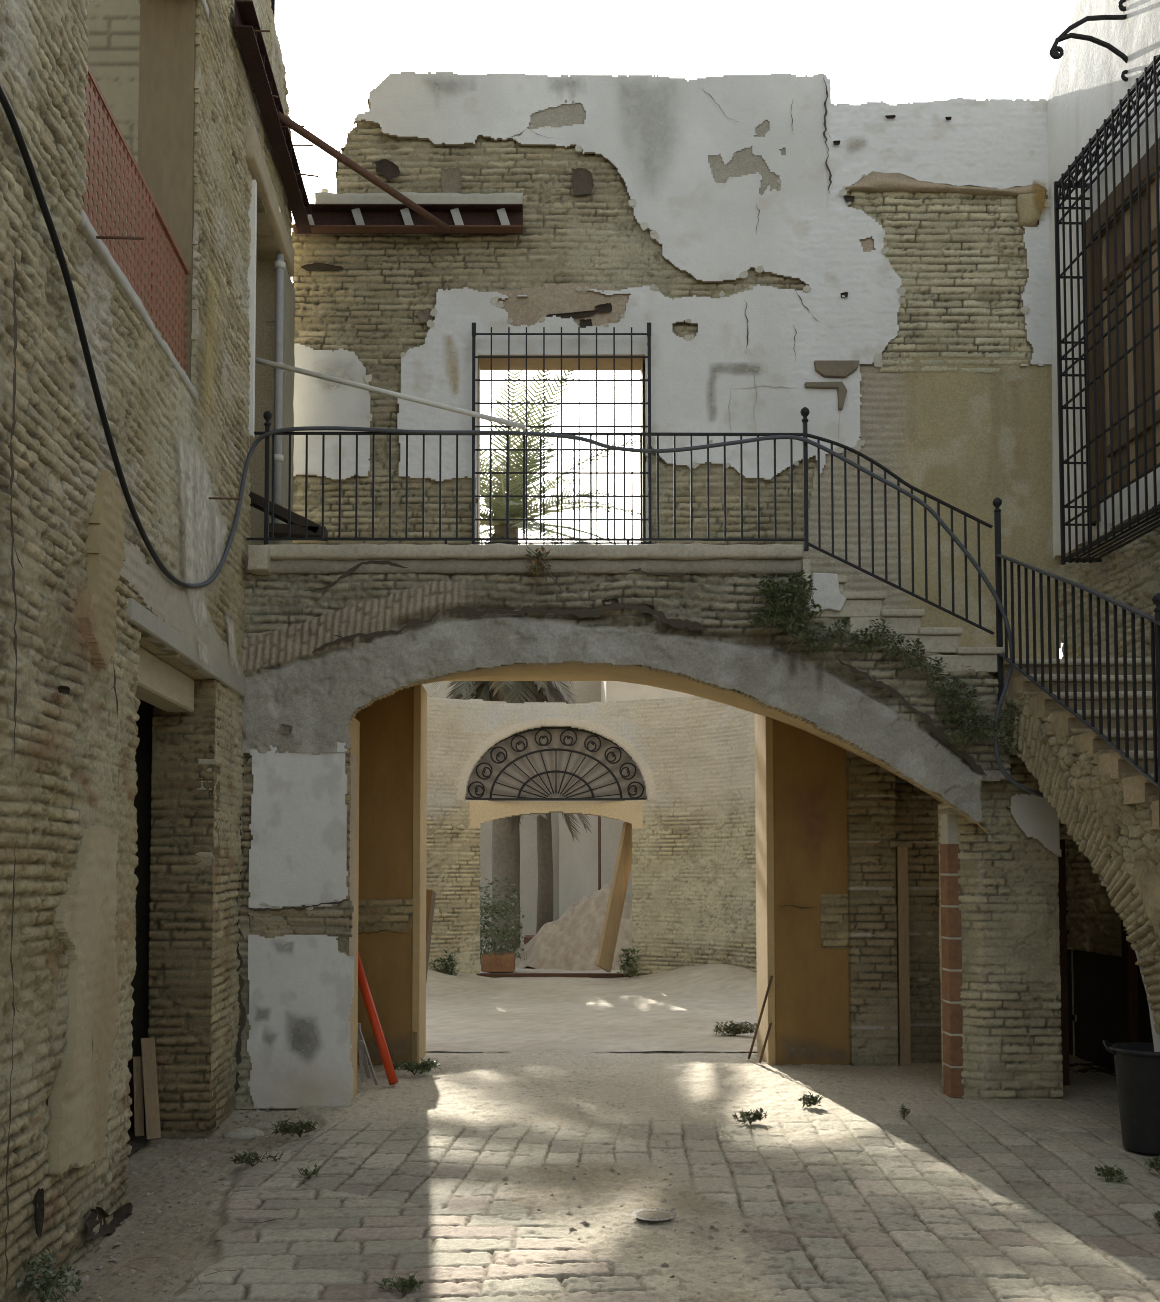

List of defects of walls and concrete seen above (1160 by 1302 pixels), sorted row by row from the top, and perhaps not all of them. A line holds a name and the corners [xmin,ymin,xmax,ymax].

peeling [527,100,586,129]
crack [10,257,23,756]
flaking render [291,117,811,546]
flaking render [646,174,1160,659]
crack [0,838,23,1295]
damp [291,1020,318,1058]
spalling [248,899,414,939]
flaking render [1008,794,1122,957]